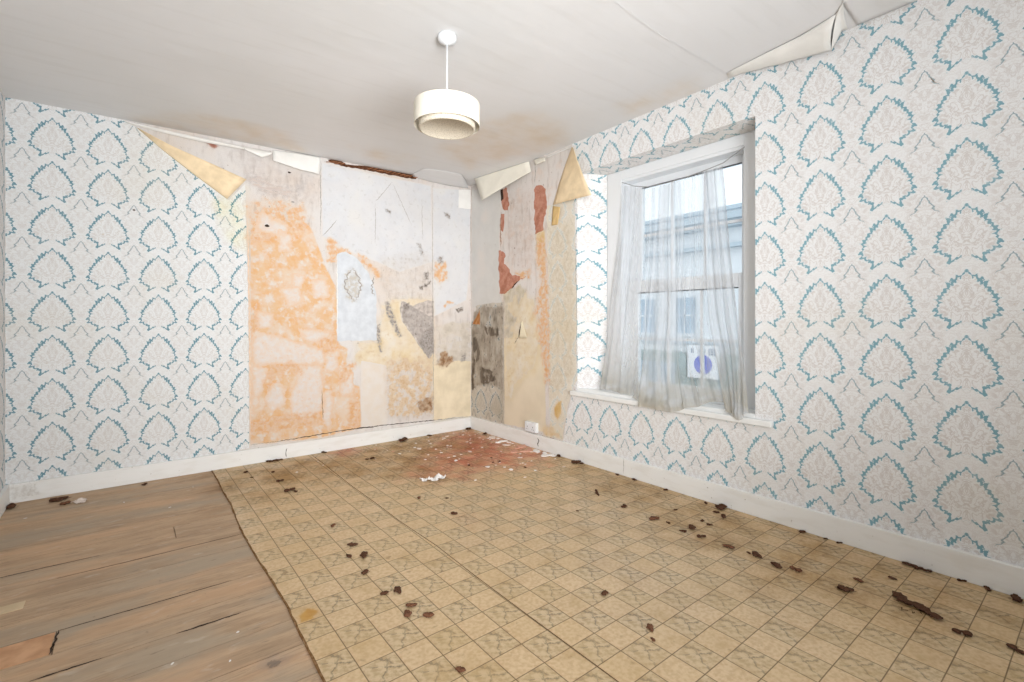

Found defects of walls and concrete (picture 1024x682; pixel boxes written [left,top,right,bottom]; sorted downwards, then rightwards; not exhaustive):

peeling [137,128,246,199]
peeling [245,198,313,253]
flaking render [326,159,418,179]
flaking render [500,187,509,232]
peeling [534,147,591,234]
peeling [280,273,330,308]
flaking render [498,250,526,294]
damp [355,231,551,431]
peeling [250,303,356,430]